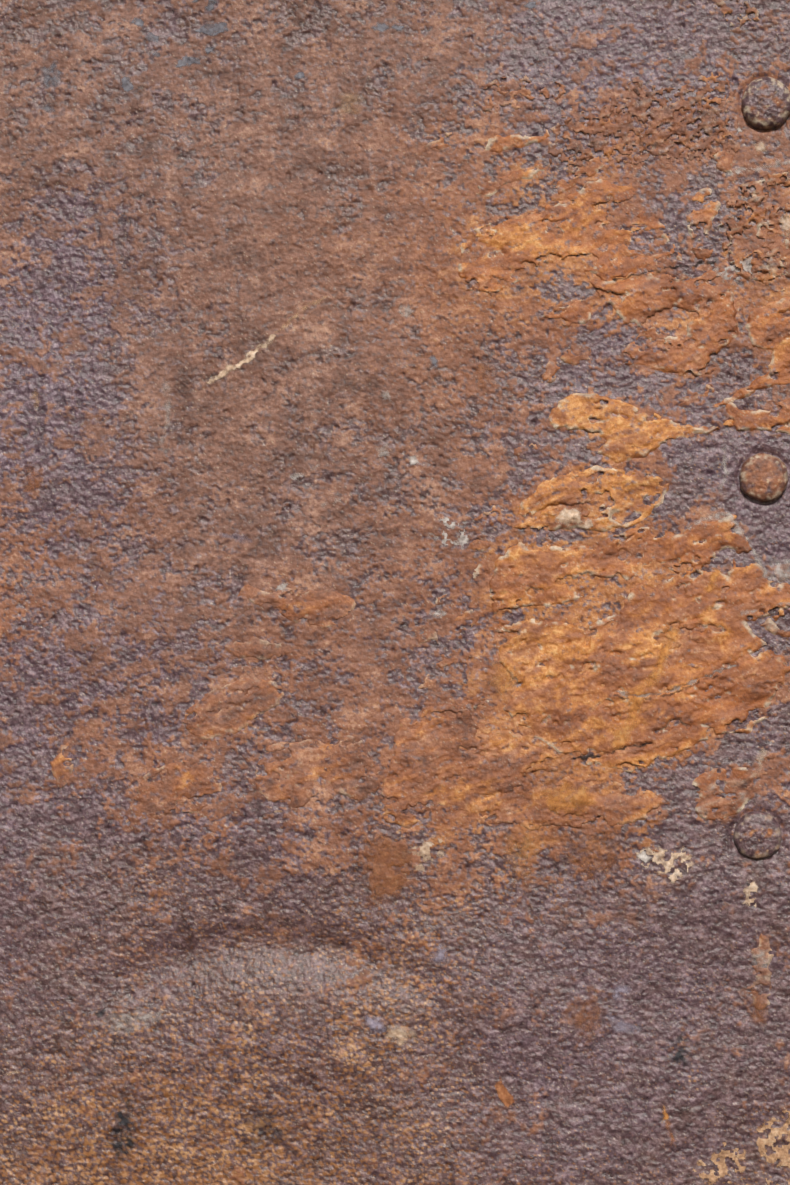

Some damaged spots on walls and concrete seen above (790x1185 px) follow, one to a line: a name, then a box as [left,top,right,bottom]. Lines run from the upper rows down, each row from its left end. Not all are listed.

corrosion [255,72,790,898]
spalling [557,508,593,529]
corrosion [237,584,356,629]
corrosion [182,678,284,740]
corrosion [50,742,74,788]
corrosion [126,760,222,823]